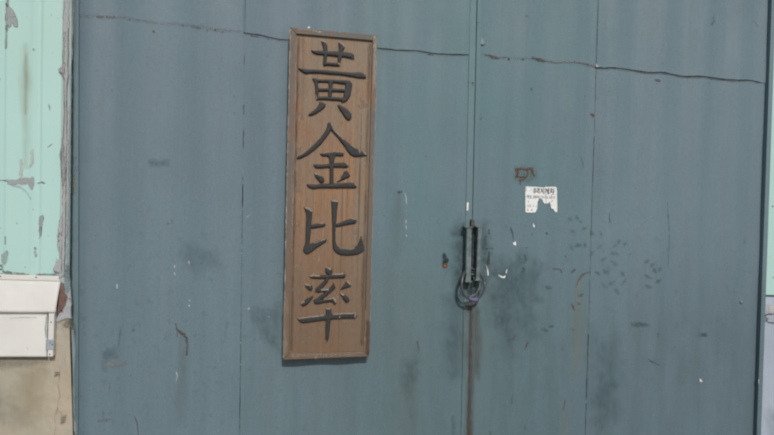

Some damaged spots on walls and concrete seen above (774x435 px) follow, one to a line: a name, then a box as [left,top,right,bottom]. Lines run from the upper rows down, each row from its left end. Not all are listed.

peeling [5,0,18,48]
peeling [38,0,71,322]